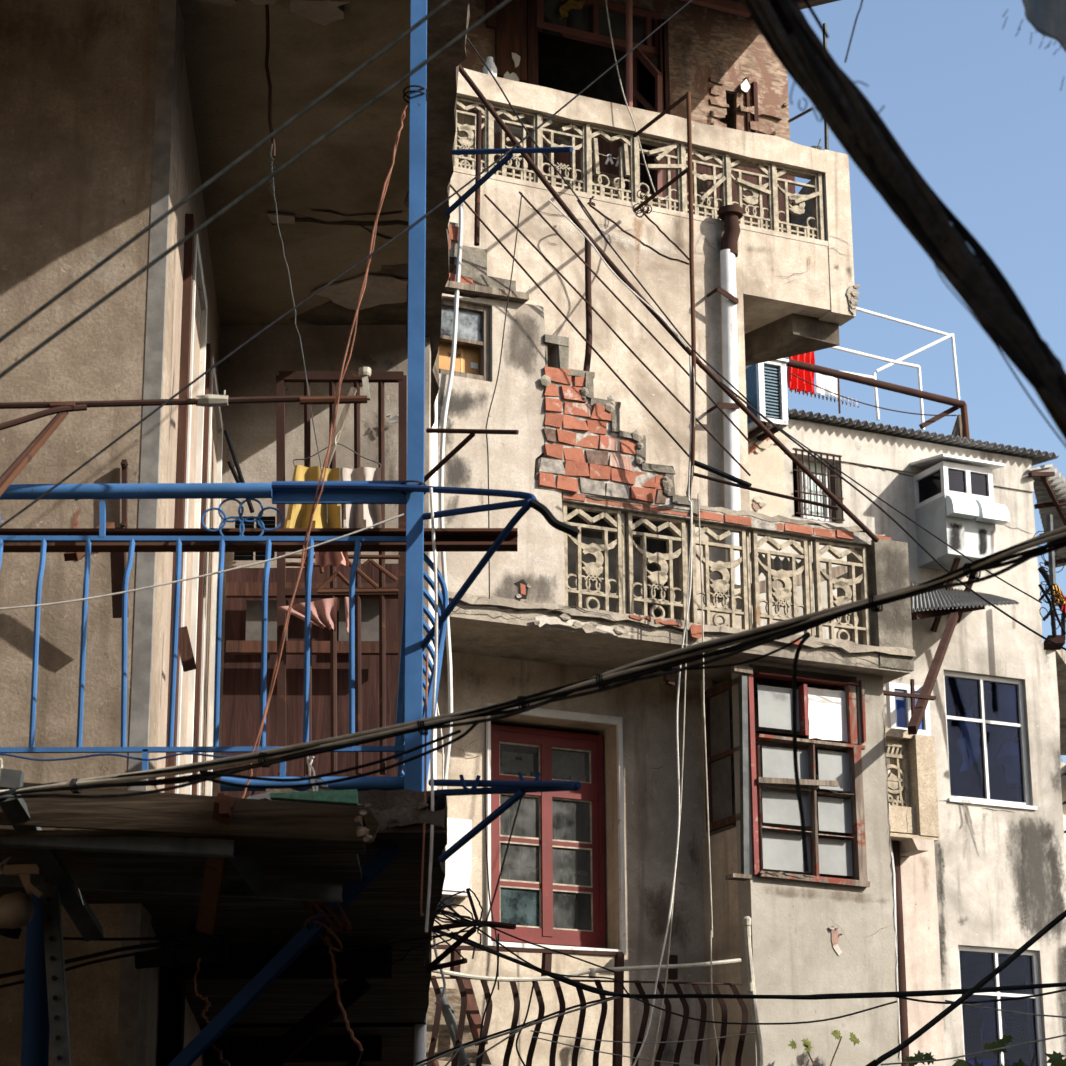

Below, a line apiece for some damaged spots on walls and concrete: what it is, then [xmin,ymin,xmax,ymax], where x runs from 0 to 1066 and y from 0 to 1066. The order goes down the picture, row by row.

peeling [290,0,350,25]
peeling [311,273,408,311]
leakage [510,315,535,370]
flaking render [536,366,767,526]
spalling [776,523,854,540]
flaking render [515,579,531,604]
flaking render [534,613,702,639]
leakage [1010,819,1064,934]